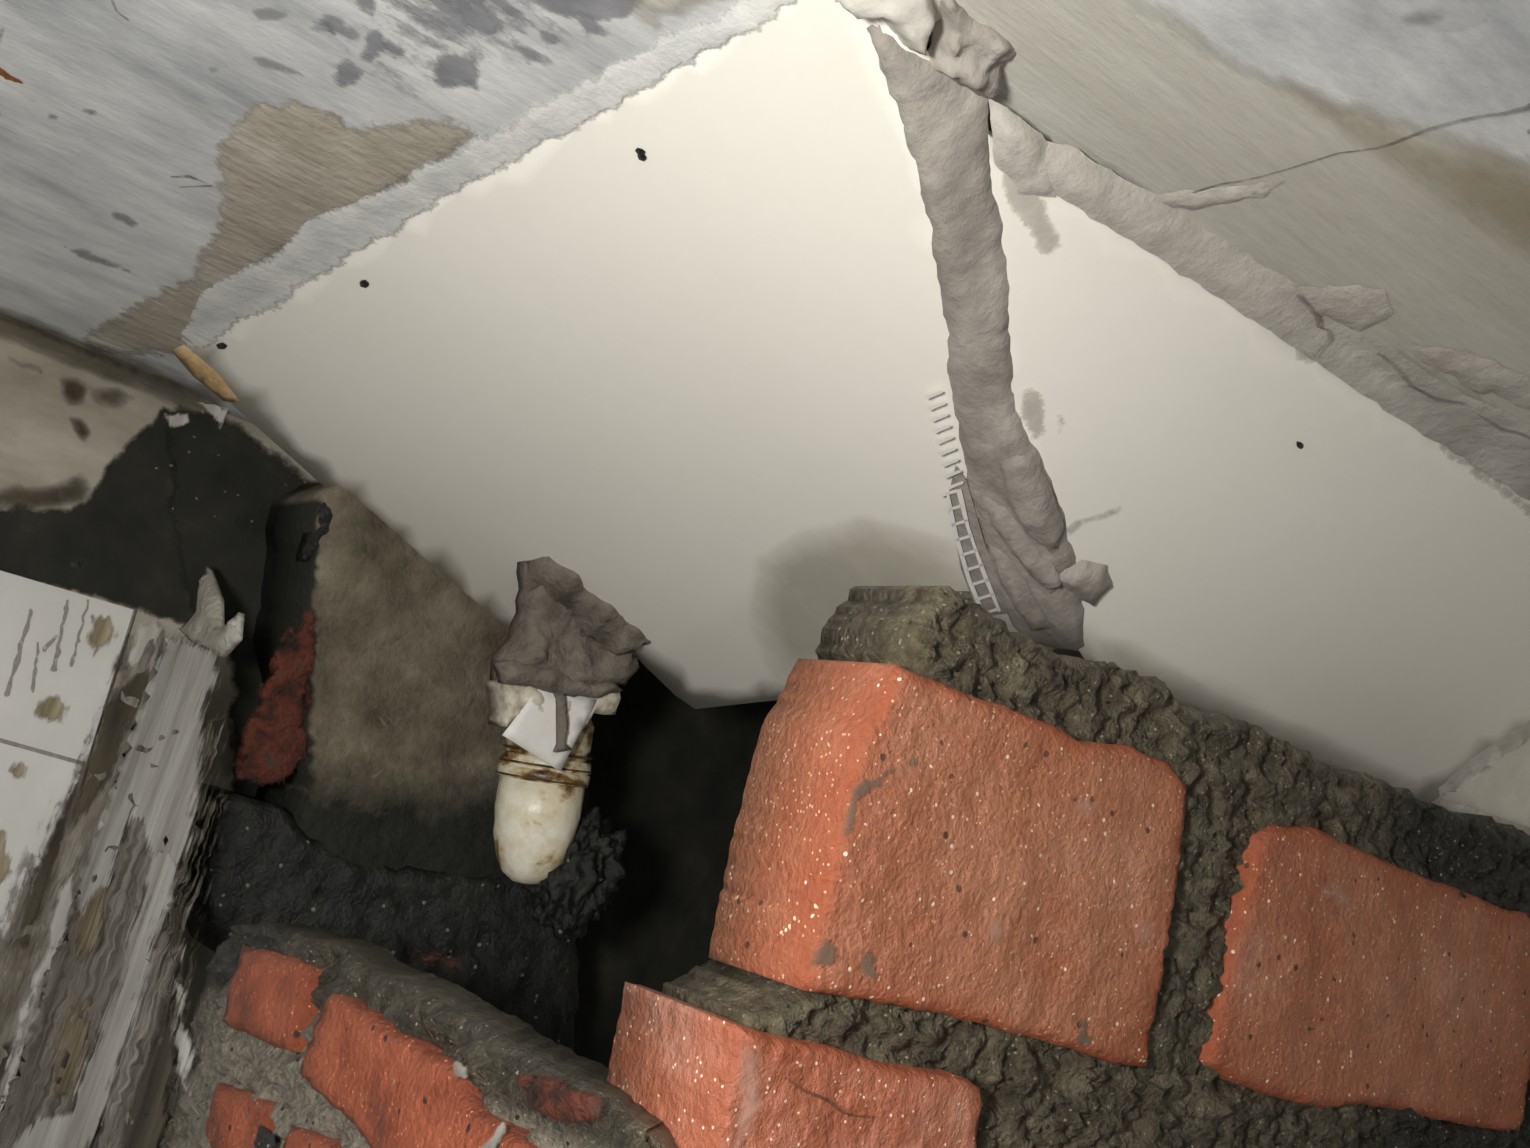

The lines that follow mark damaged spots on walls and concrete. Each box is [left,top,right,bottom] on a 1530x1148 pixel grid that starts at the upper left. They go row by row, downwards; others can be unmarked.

rust [0,68,23,83]
leakage [321,0,402,87]
leakage [393,0,554,89]
leakage [535,0,641,35]
crack [1195,103,1530,193]
peeling [1156,181,1284,210]
leakage [0,312,315,1148]
leakage [573,660,777,1069]